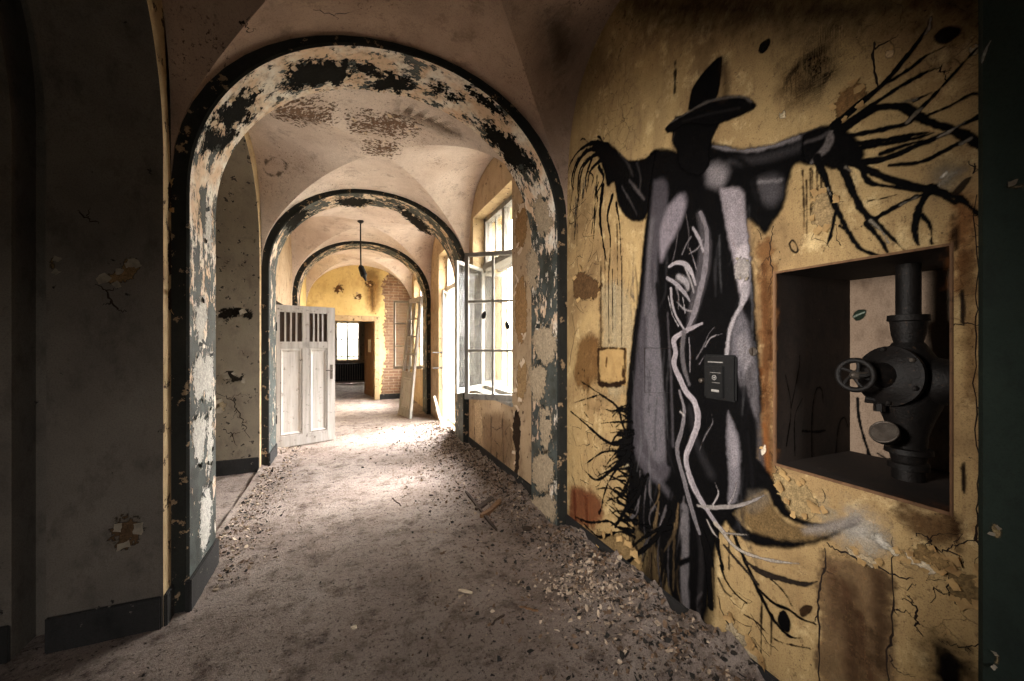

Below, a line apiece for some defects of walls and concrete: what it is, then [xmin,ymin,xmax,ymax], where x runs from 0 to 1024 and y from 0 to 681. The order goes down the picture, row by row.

peeling [201,57,536,175]
peeling [203,199,214,253]
peeling [286,206,311,234]
peeling [333,197,373,209]
peeling [398,206,433,237]
flaking render [334,273,412,394]
peeling [511,192,558,523]
crack [954,161,978,451]
peeling [191,295,253,558]
peeling [474,400,483,444]
peeling [773,467,828,521]
crack [815,479,978,681]